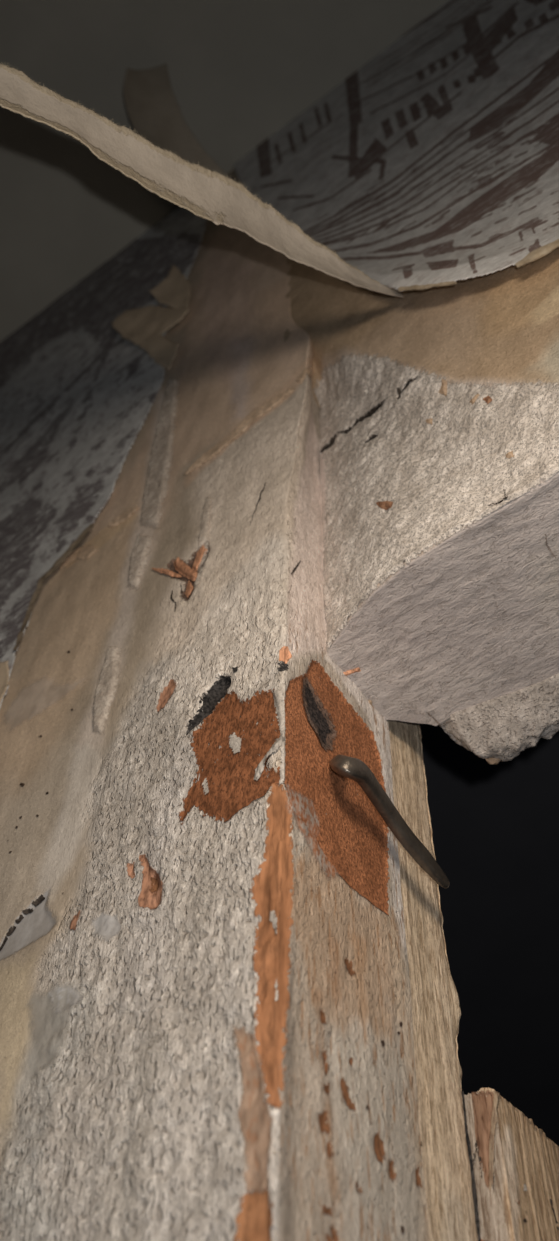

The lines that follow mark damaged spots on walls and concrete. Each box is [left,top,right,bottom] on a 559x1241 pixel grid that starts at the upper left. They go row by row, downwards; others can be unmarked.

crack [321,374,420,453]
spalling [156,679,176,712]
corrosion [322,1050,356,1111]
corrosion [318,1110,334,1158]
corrosion [374,1132,397,1182]
corrosion [322,1204,339,1241]